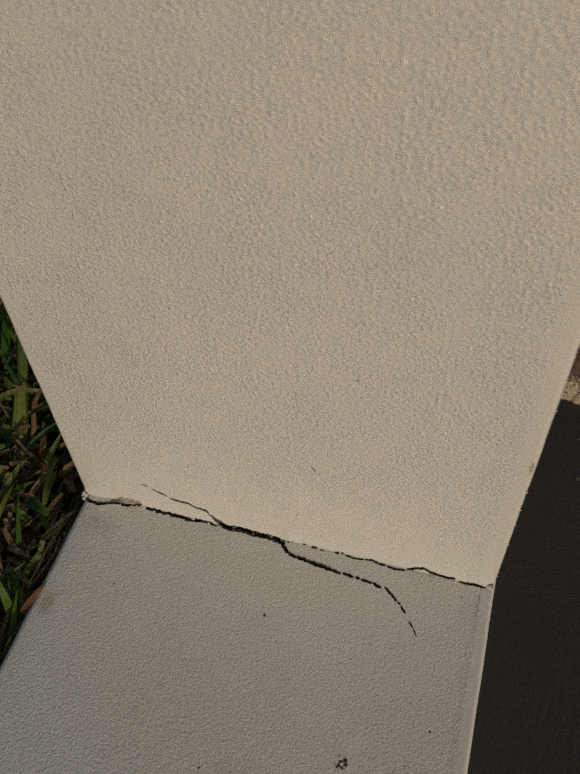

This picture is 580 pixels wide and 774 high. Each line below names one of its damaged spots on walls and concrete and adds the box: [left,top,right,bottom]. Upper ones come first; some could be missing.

crack [87,484,486,636]